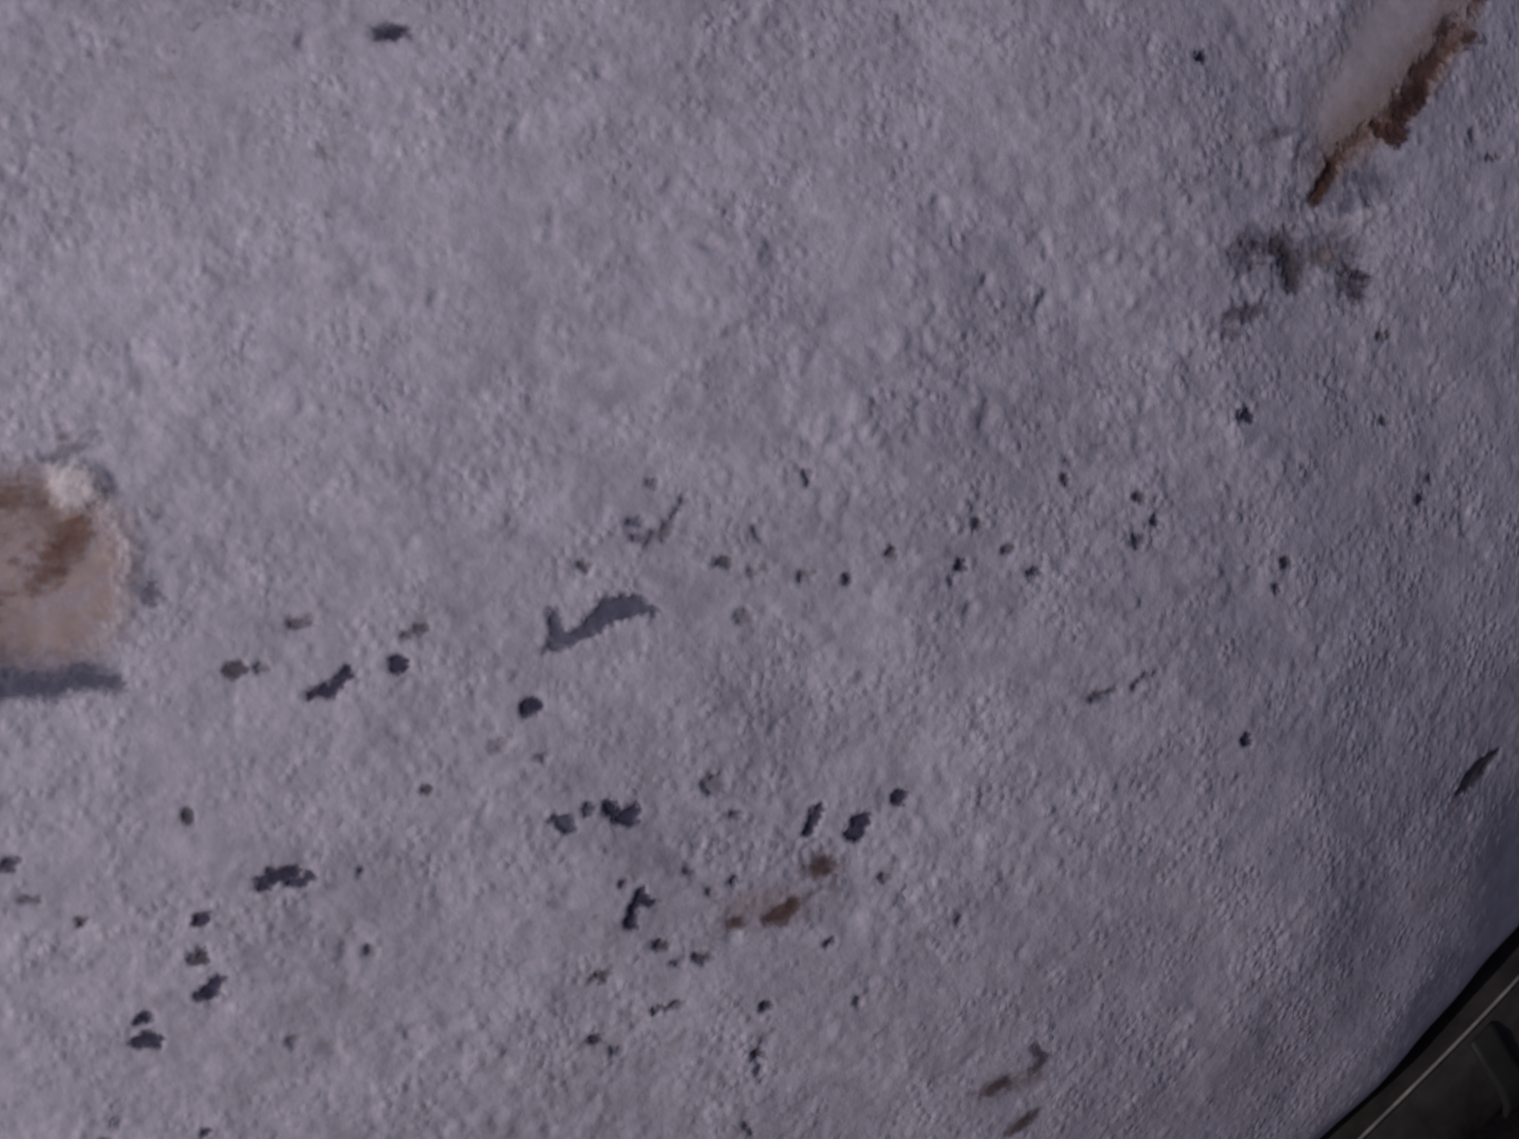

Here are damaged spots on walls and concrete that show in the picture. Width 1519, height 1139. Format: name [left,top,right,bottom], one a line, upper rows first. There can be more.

peeling [543,593,656,653]
peeling [307,665,353,700]
spalling [1455,748,1499,795]
peeling [550,800,641,833]
peeling [802,803,823,837]
peeling [843,813,870,842]
peeling [254,866,315,892]
peeling [621,880,655,930]